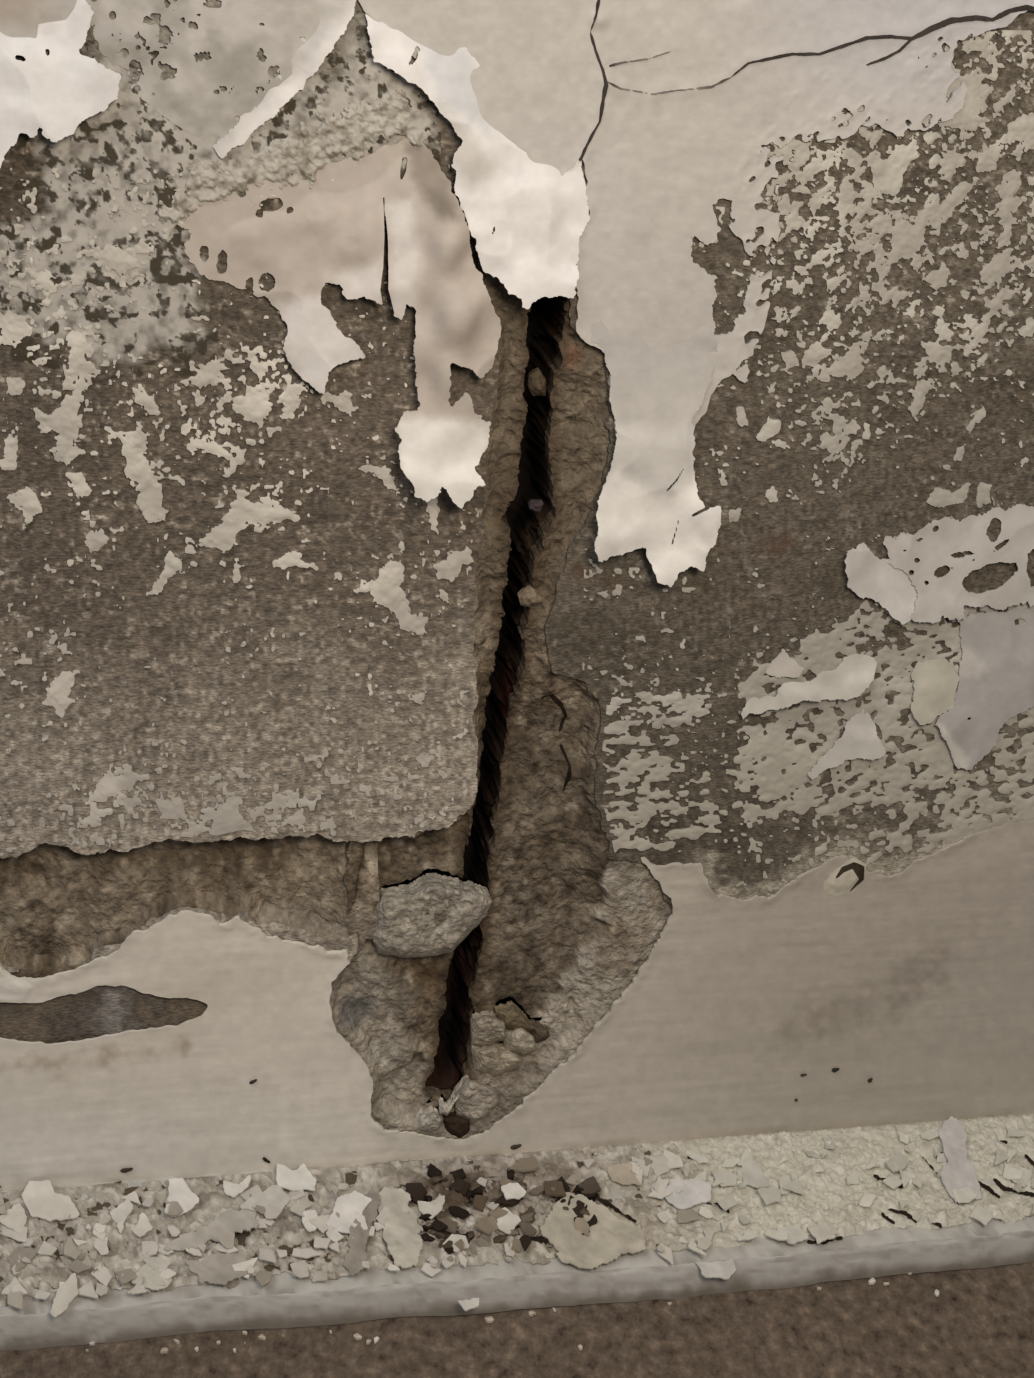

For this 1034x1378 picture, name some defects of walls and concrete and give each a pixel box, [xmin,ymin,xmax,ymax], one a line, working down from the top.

crack [579,0,1034,161]
peeling [0,0,672,1139]
crack [463,296,572,889]
peeling [544,11,1034,900]
crack [425,925,482,1090]